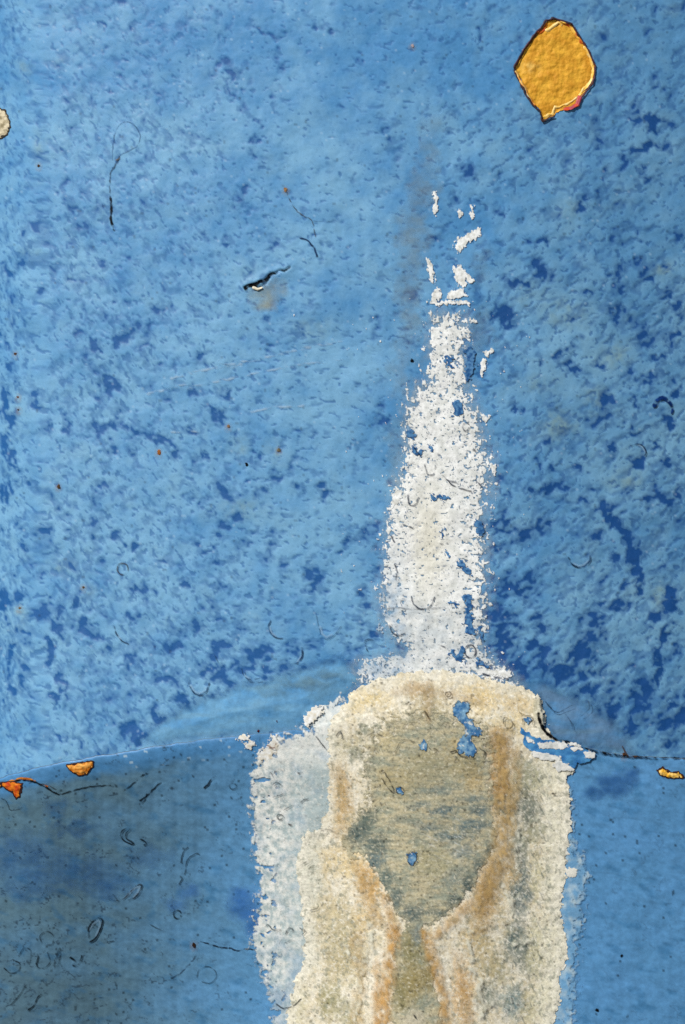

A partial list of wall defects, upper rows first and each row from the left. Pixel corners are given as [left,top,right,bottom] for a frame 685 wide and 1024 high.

peeling [513,17,596,122]
crack [243,267,290,290]
spalling [235,205,596,1024]
crack [537,702,685,759]
peeling [0,781,23,799]
peeling [66,760,94,776]
peeling [656,766,684,779]
corrosion [375,929,396,1024]